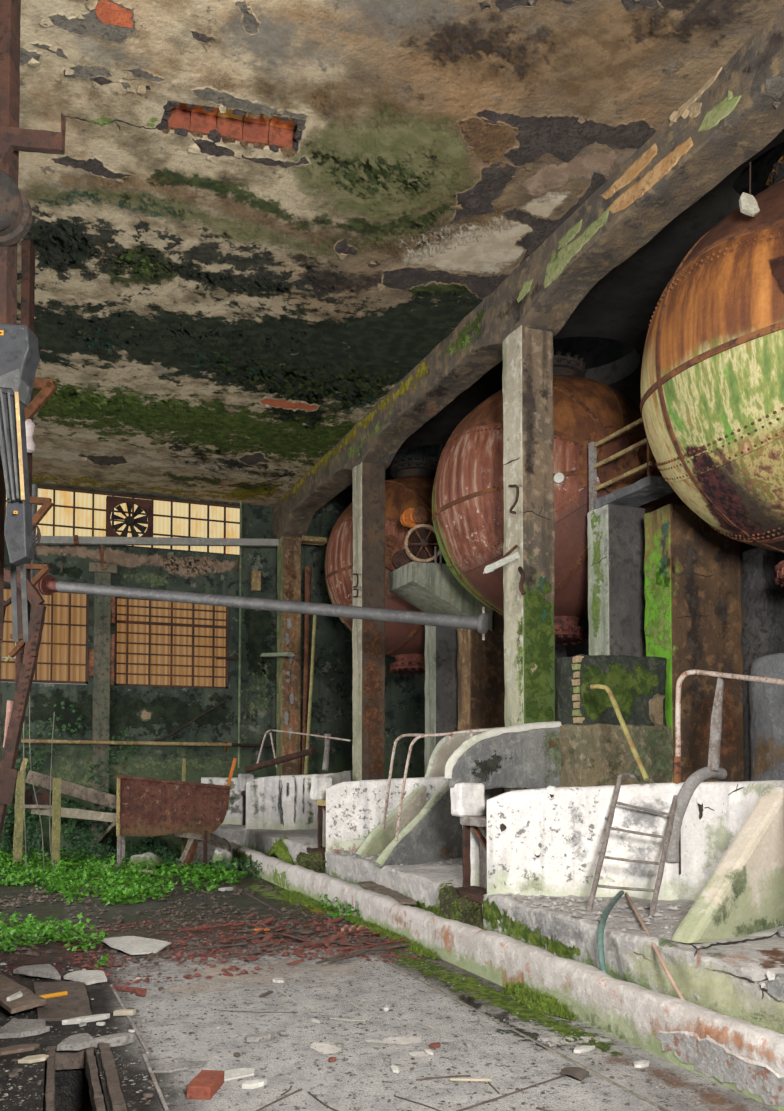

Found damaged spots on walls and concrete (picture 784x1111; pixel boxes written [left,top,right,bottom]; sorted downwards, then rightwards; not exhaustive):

spalling [20,0,168,94]
damp [349,0,750,110]
spalling [156,85,311,170]
spalling [333,67,742,303]
damp [16,149,620,420]
spalling [257,395,320,412]
damp [523,362,549,473]
crack [690,932,784,1003]
corrosion [652,1070,745,1111]
corrosion [653,1020,774,1060]
spalling [656,1030,784,1106]